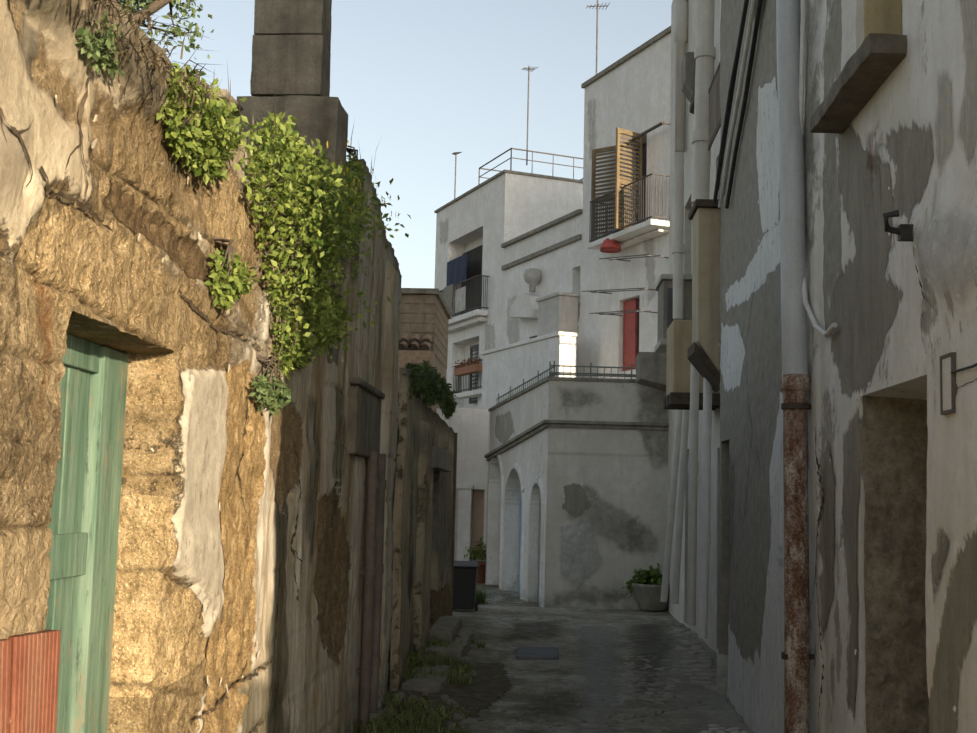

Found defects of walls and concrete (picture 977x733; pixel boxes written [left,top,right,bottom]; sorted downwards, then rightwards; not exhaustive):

peeling [8,0,24,52]
crack [0,75,113,232]
peeling [31,29,111,165]
peeling [103,175,215,282]
peeling [819,119,933,719]
peeling [313,490,352,664]
peeling [928,516,977,733]